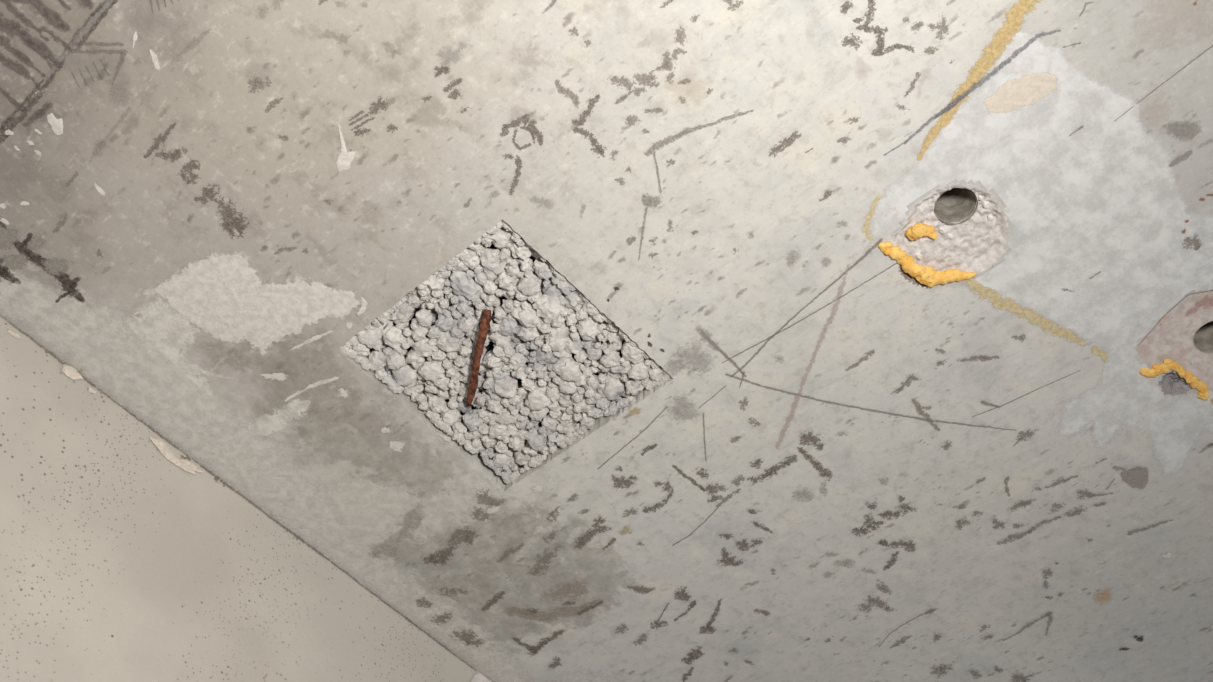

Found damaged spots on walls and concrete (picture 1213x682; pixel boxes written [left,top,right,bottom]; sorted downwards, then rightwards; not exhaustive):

crack [884,30,1062,155]
crack [1115,45,1213,121]
peeling [627,221,674,259]
crack [1138,290,1213,346]
rust [466,309,491,407]